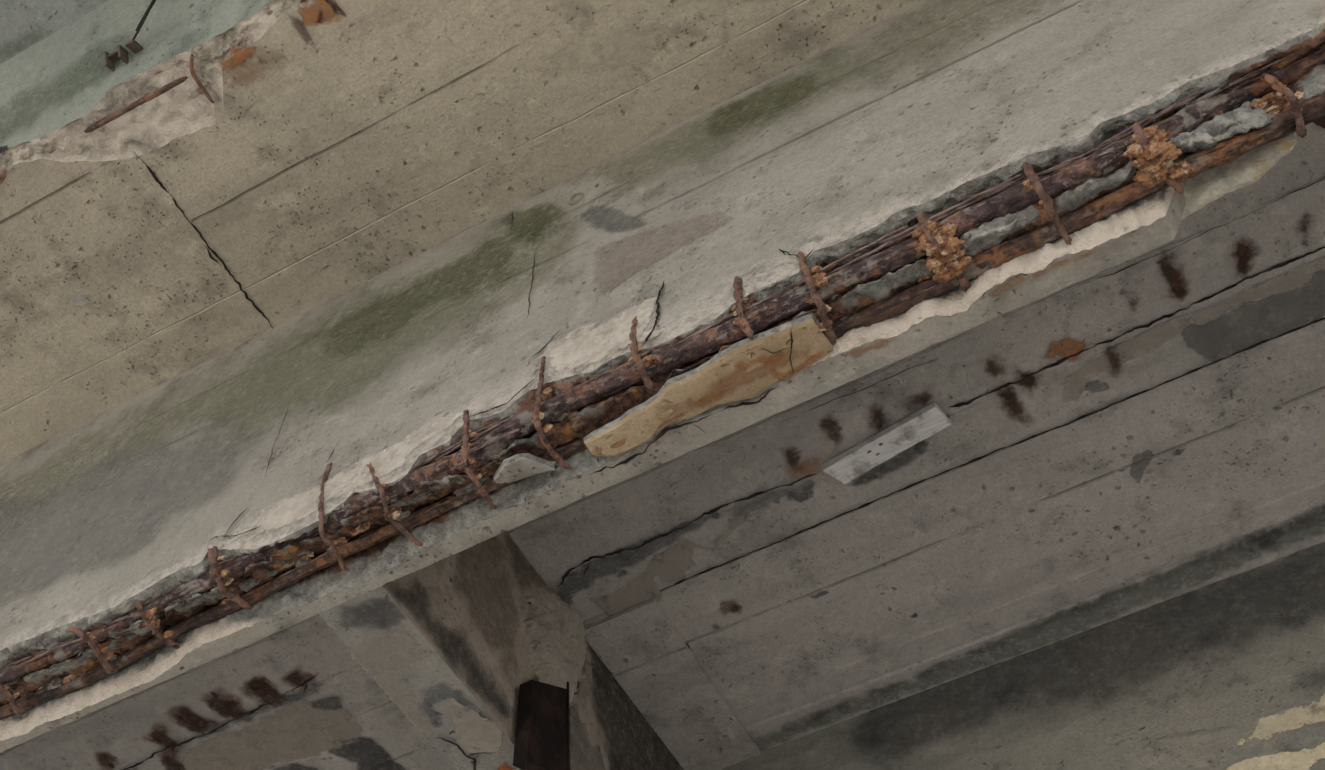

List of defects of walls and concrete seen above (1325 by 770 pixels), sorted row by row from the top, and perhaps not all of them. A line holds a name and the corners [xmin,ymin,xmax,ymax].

corrosion [293,0,346,42]
spalling [0,0,316,184]
crack [133,151,273,329]
corrosion [912,220,972,283]
spalling [806,23,1325,367]
corrosion [1122,126,1195,188]
water stain [1181,270,1325,361]
spalling [0,270,834,741]
crack [558,473,817,586]
crack [662,318,1325,591]
water stain [1130,450,1153,482]
corrosion [146,672,314,770]